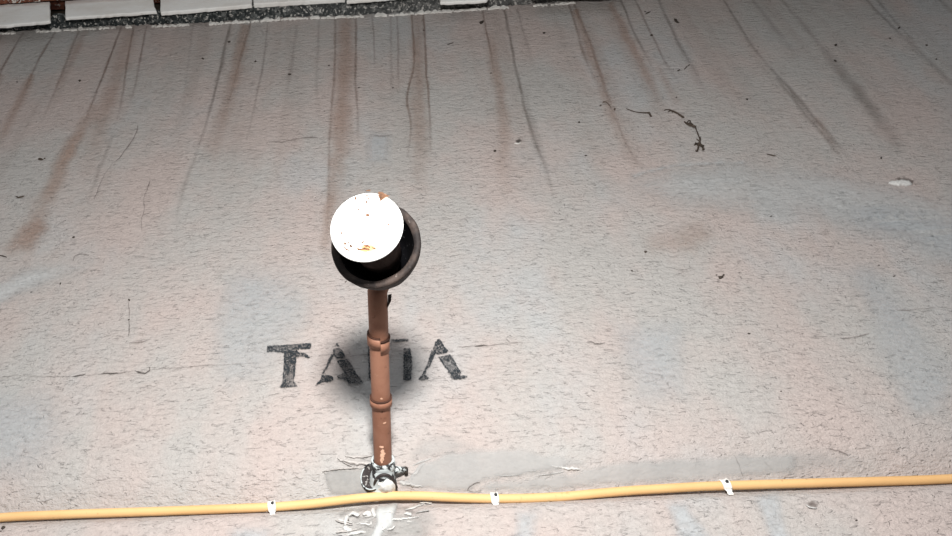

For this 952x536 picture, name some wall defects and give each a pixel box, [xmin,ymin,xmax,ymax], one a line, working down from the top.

spalling [335,501,432,536]